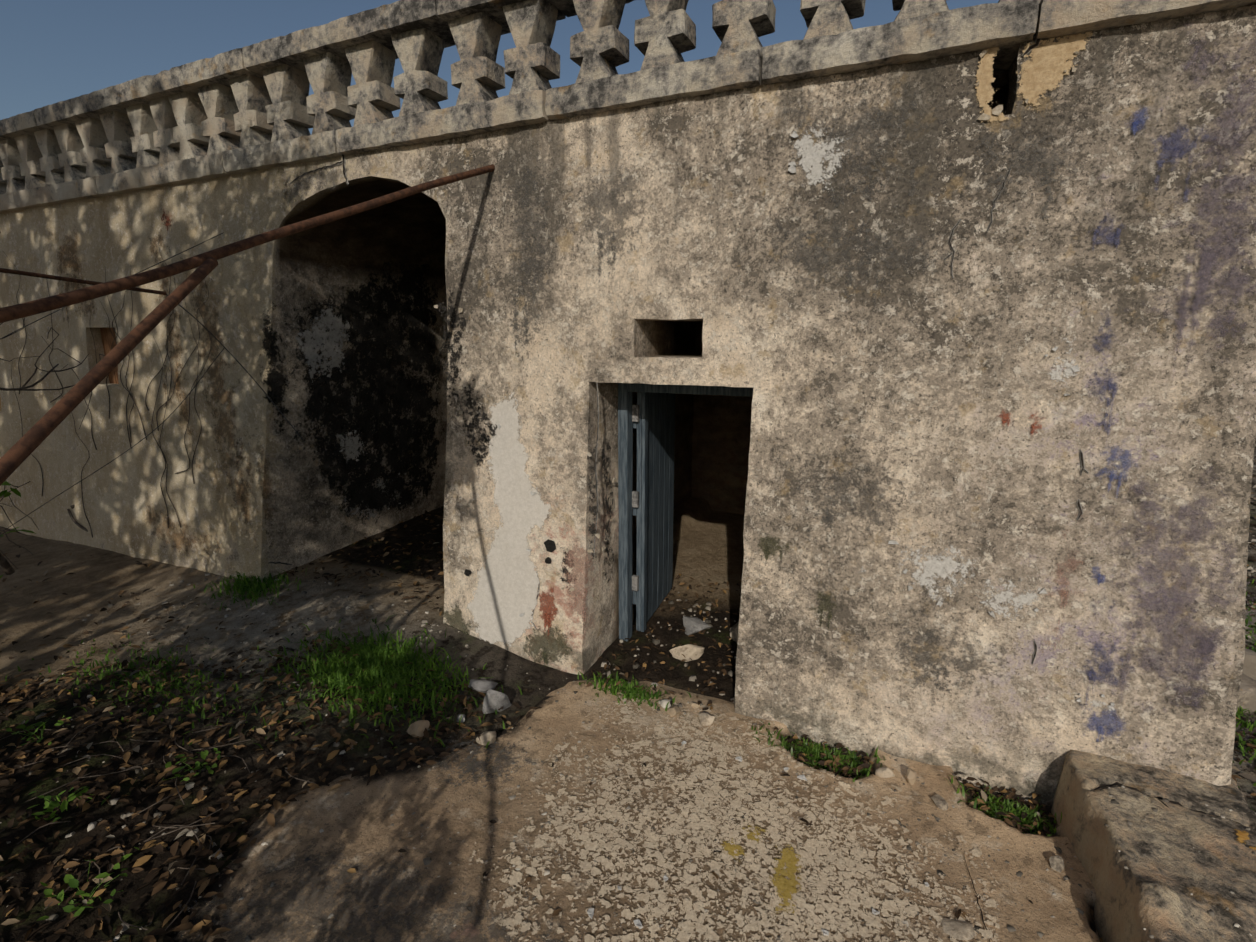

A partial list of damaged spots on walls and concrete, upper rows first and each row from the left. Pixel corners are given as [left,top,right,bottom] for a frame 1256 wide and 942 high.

spalling [974,46,1010,124]
spalling [1016,31,1093,111]
water stain [193,282,276,547]
water stain [259,261,446,522]
corrosion [539,588,557,636]